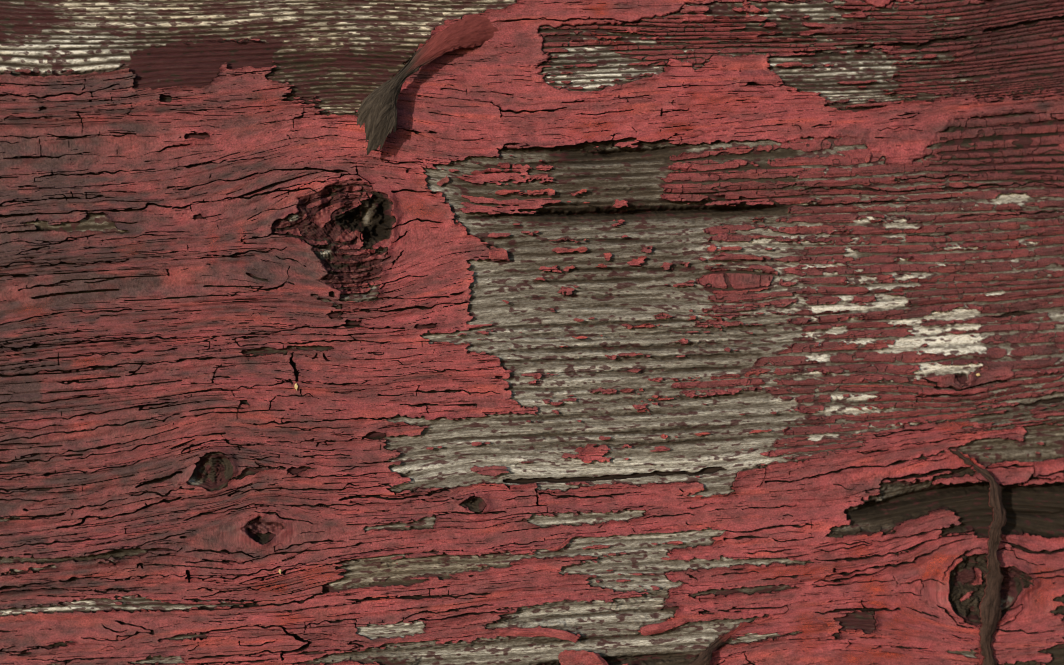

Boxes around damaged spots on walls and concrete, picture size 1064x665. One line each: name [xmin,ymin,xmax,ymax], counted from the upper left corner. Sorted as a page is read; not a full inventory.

crack [0,84,120,102]
peeling [0,0,517,155]
crack [492,96,631,148]
peeling [537,0,1064,112]
crack [0,135,436,296]
peeling [362,115,1064,538]
crack [0,218,727,665]
peeling [0,546,148,574]
peeling [0,595,255,616]
peeling [117,632,208,665]
peeling [305,509,814,665]